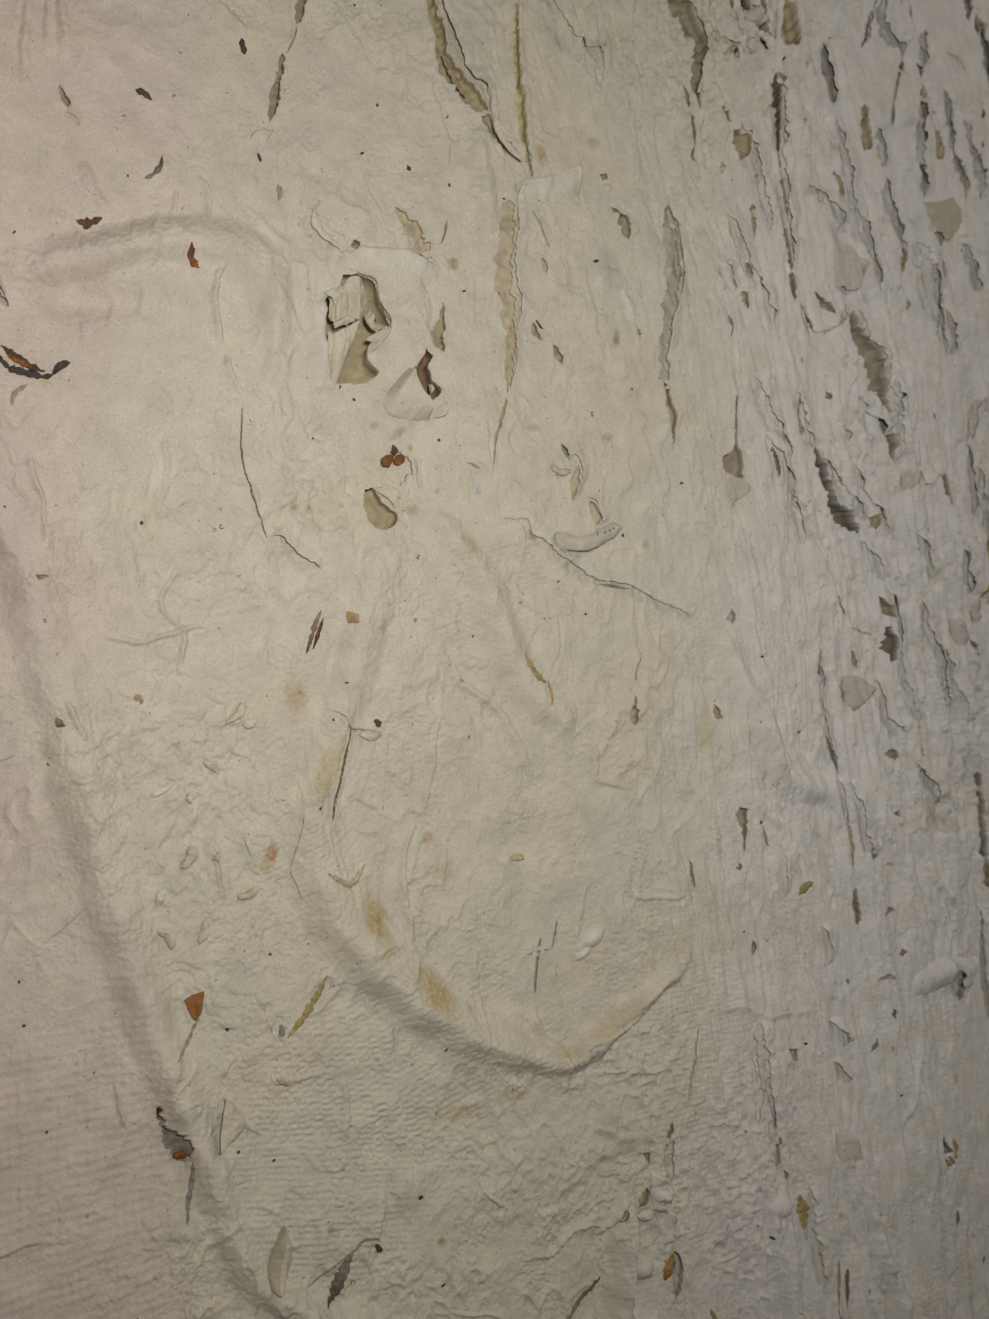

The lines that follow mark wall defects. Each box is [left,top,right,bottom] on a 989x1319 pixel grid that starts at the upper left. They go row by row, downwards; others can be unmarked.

peeling [413,0,453,168]
peeling [709,0,785,61]
spalling [598,170,641,241]
peeling [741,36,888,333]
peeling [885,0,989,356]
spalling [321,205,450,421]
hole [360,450,417,532]
peeling [499,439,703,617]
peeling [753,366,811,467]
peeling [858,390,900,436]
peeling [942,543,986,721]
peeling [815,640,877,826]